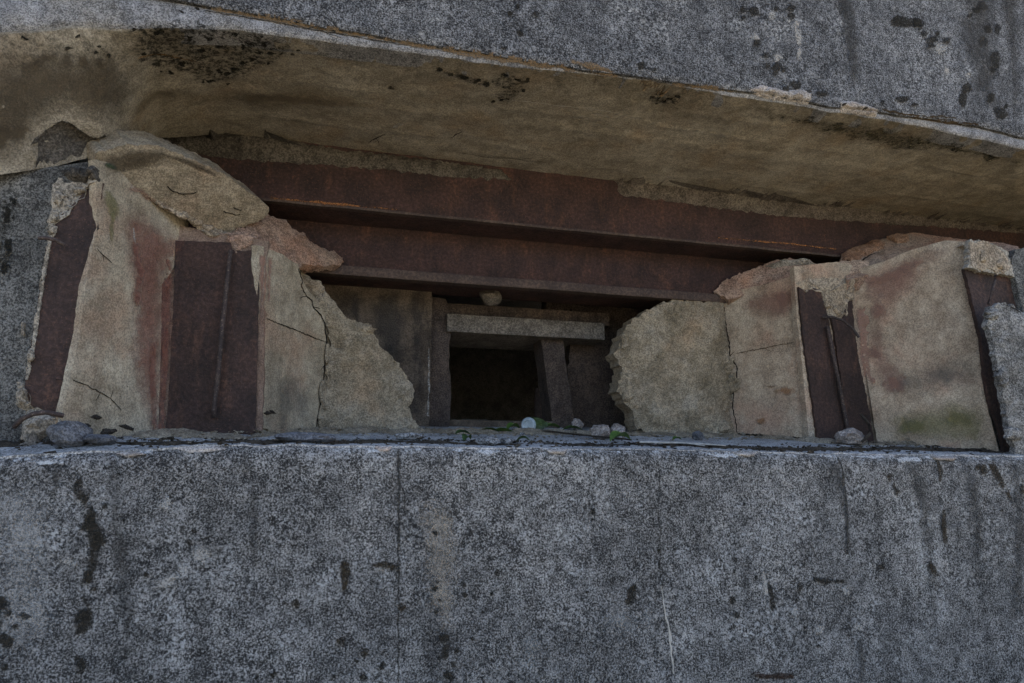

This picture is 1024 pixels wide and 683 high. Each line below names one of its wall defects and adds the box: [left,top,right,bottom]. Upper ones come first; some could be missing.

leakage [132,7,300,85]
leakage [436,67,530,104]
spalling [750,85,816,123]
spalling [829,101,879,131]
spalling [163,129,511,181]
spalling [151,196,343,274]
corrosion [270,198,360,207]
spalling [615,177,1024,276]
spalling [15,120,107,447]
peeling [796,276,855,318]
crack [268,269,327,427]
spalling [84,414,134,434]